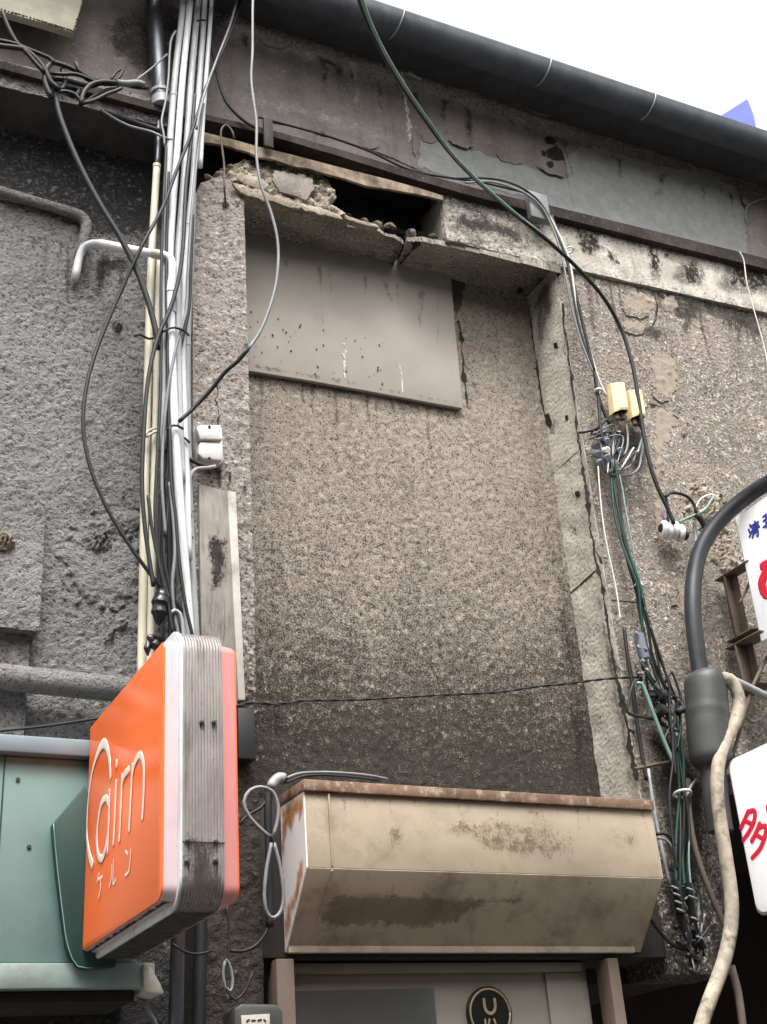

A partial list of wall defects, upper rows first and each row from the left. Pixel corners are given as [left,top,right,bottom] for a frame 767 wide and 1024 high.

spalling [177,132,438,258]
water stain [577,228,620,264]
water stain [639,245,669,276]
water stain [674,263,703,284]
water stain [724,264,767,292]
crack [457,320,468,405]
crack [528,304,545,417]
crack [553,303,639,781]